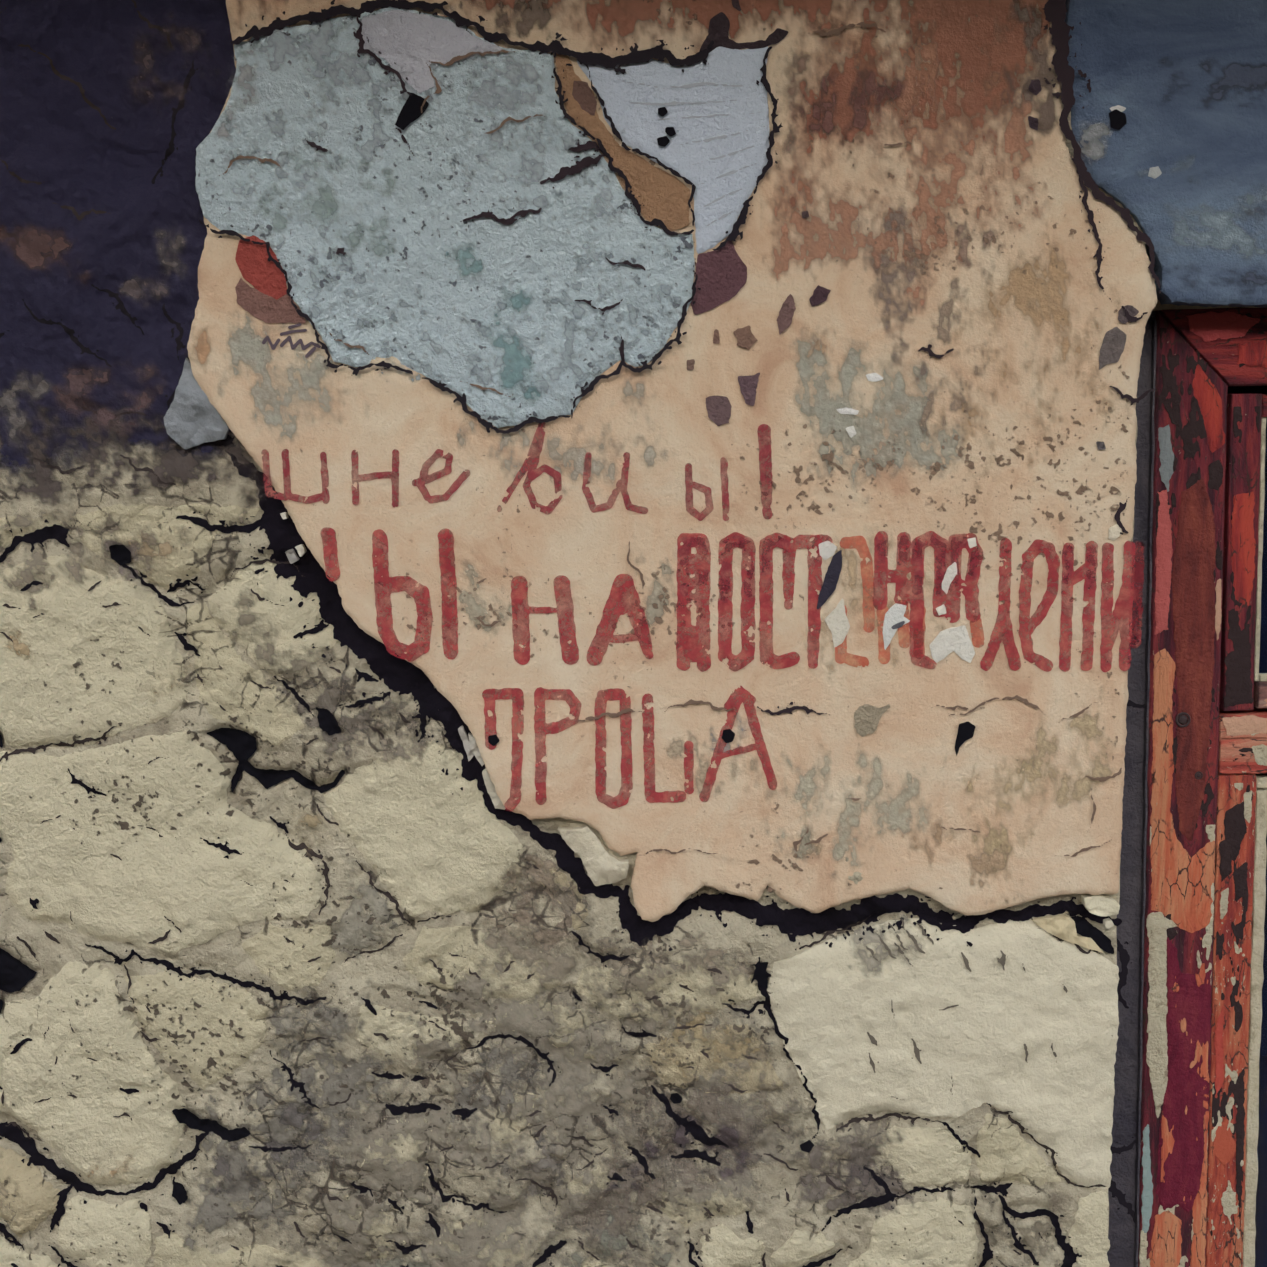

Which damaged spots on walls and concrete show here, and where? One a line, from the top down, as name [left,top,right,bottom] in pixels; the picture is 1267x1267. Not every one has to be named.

water stain [786,55,905,152]
water stain [1006,0,1058,133]
crack [1039,0,1161,322]
peeling [195,0,788,428]
peeling [164,358,229,449]
crack [1109,386,1157,405]
crack [1127,700,1145,713]
crack [0,284,1136,1267]
peeling [1139,311,1267,1267]
peeling [558,825,629,886]
peeling [1032,913,1103,953]
peeling [1081,894,1120,928]